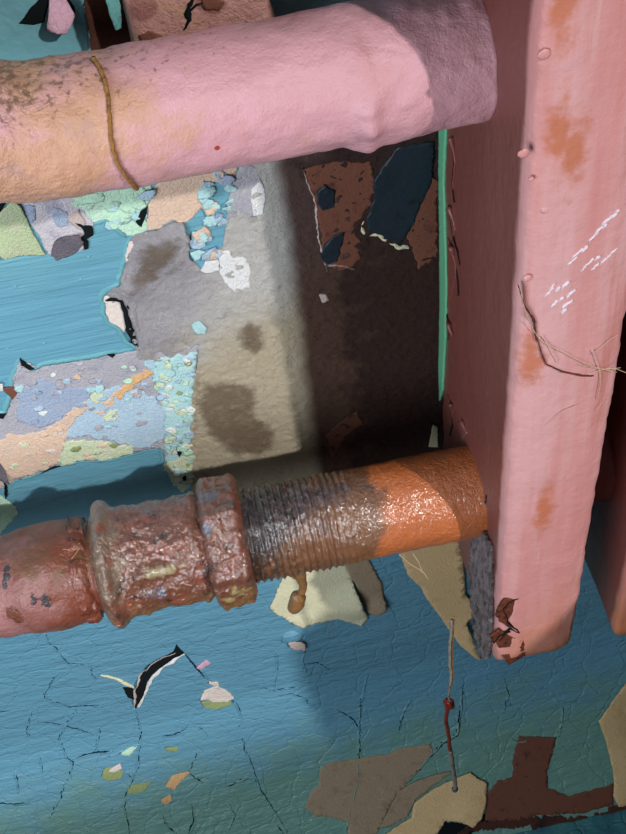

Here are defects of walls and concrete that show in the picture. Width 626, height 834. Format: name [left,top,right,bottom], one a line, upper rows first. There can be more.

flaking render [19,0,131,51]
damp [136,245,175,284]
flaking render [0,131,444,533]
damp [242,326,261,351]
damp [201,386,271,453]
crack [0,633,368,834]
peeling [306,743,490,834]
peeling [599,684,626,807]